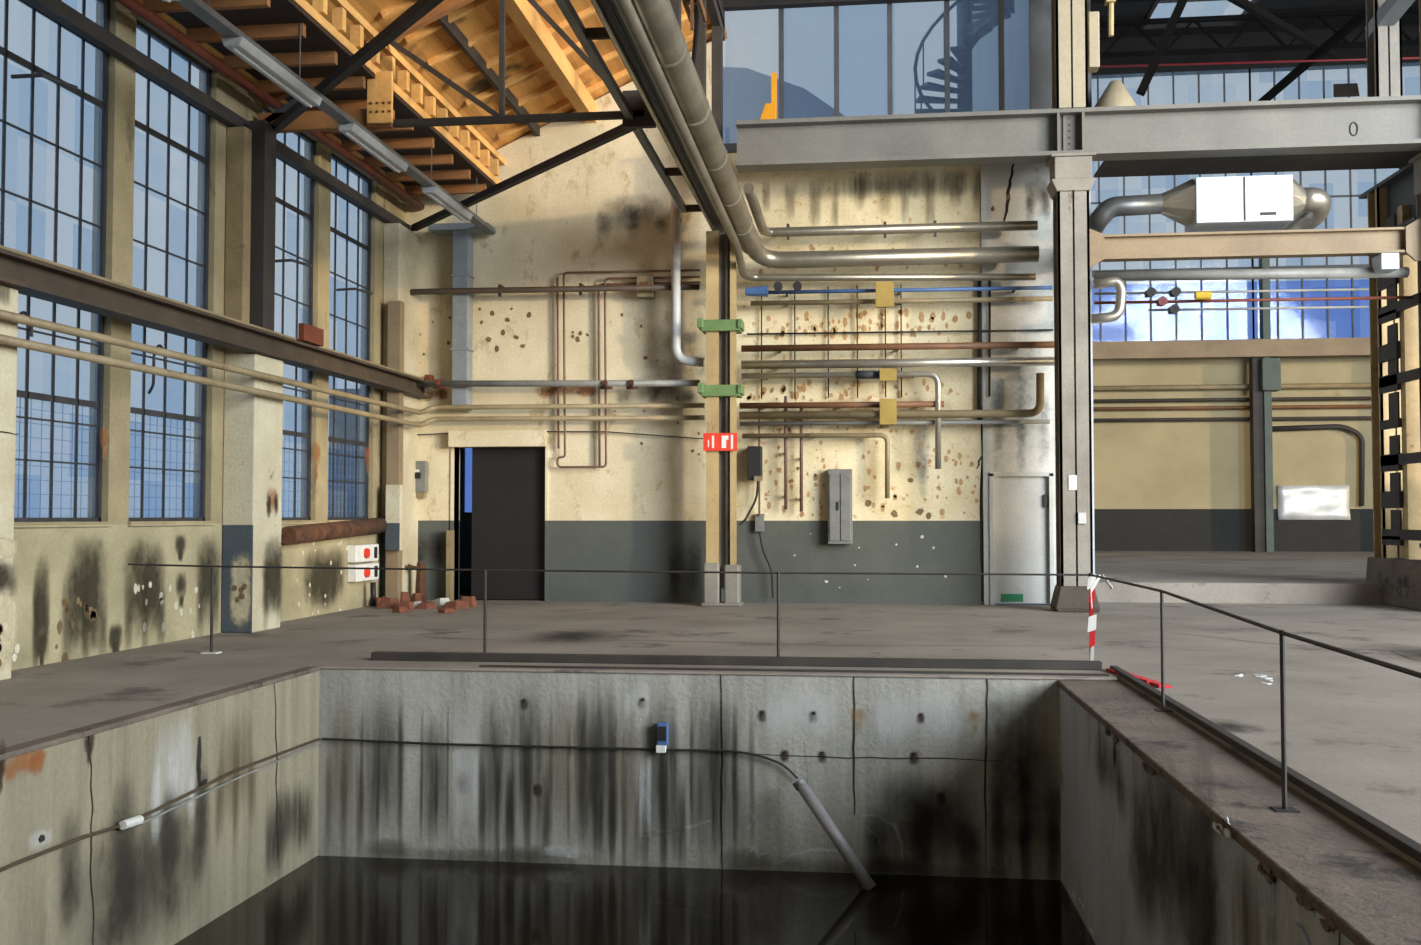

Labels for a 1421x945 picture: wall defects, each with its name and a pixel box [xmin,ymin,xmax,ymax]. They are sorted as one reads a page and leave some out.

damp [0,564,14,589]
damp [34,574,47,665]
damp [69,548,163,652]
damp [177,537,216,606]
damp [264,548,282,608]
damp [196,785,207,860]
damp [480,732,549,838]
damp [580,733,615,829]
spalling [0,666,1355,945]
damp [642,736,753,852]
damp [896,740,1060,877]
damp [101,811,177,945]